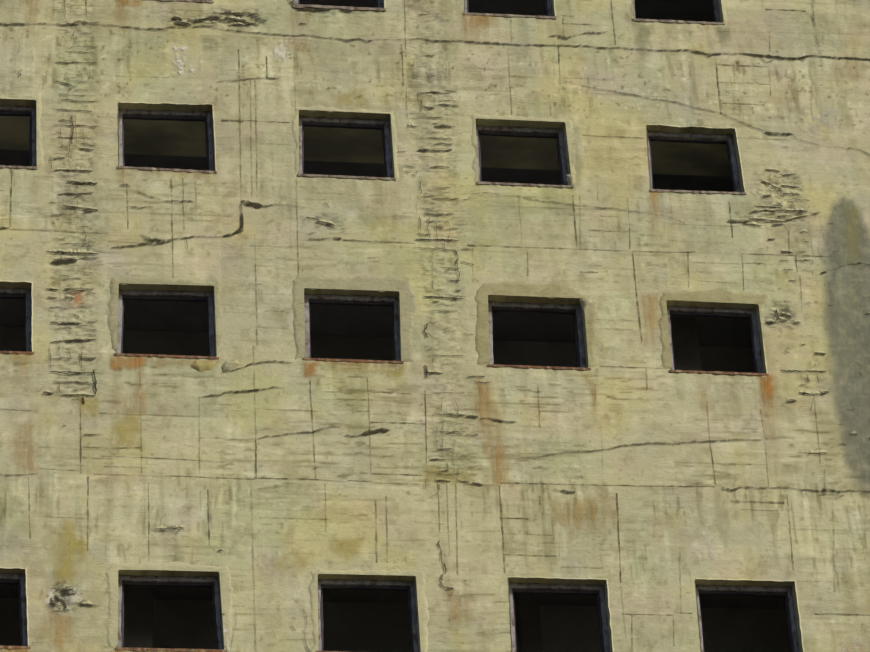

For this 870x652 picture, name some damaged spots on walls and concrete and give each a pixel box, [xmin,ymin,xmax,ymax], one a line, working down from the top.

crack [0,20,204,30]
spalling [172,10,267,27]
crack [227,29,870,63]
spalling [49,0,98,225]
crack [619,92,792,136]
crack [112,234,200,248]
crack [223,200,276,237]
spalling [405,165,474,312]
spalling [727,168,818,226]
spalling [43,275,97,404]
water stain [827,201,870,479]
spalling [49,584,97,612]